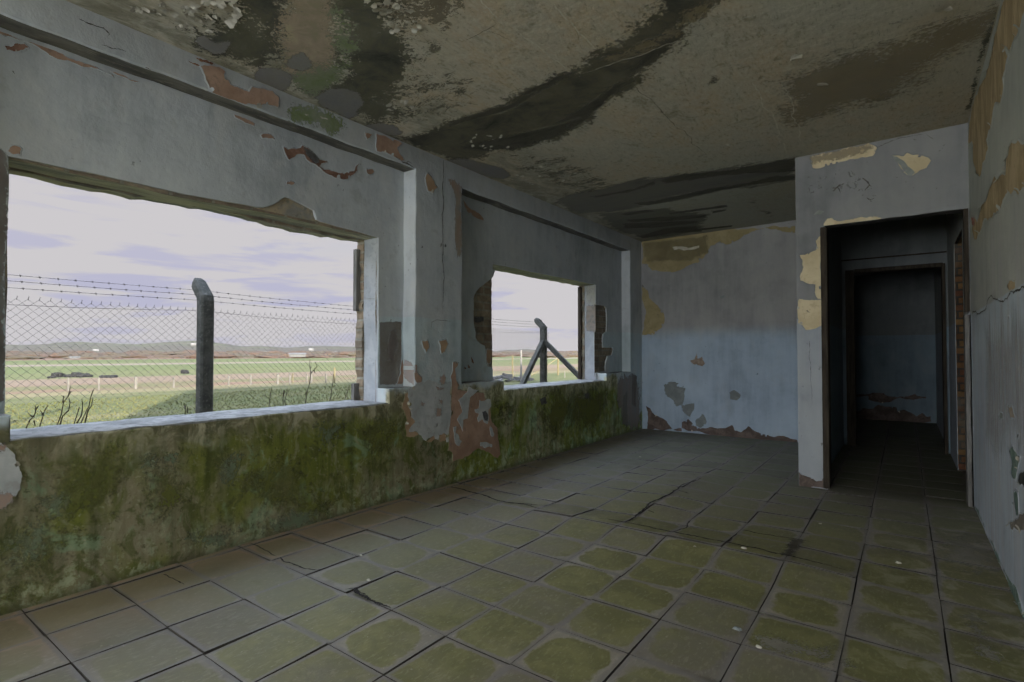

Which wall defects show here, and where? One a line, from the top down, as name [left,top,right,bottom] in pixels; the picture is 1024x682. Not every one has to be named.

water stain [175,0,299,72]
water stain [778,4,998,127]
peeling [234,115,374,181]
water stain [288,0,797,238]
peeling [968,0,1024,242]
peeling [642,225,796,273]
peeling [797,216,882,331]
crack [971,286,1024,315]
peeling [421,279,501,462]
peeling [646,381,798,442]
crack [601,479,855,572]
crack [349,587,391,608]